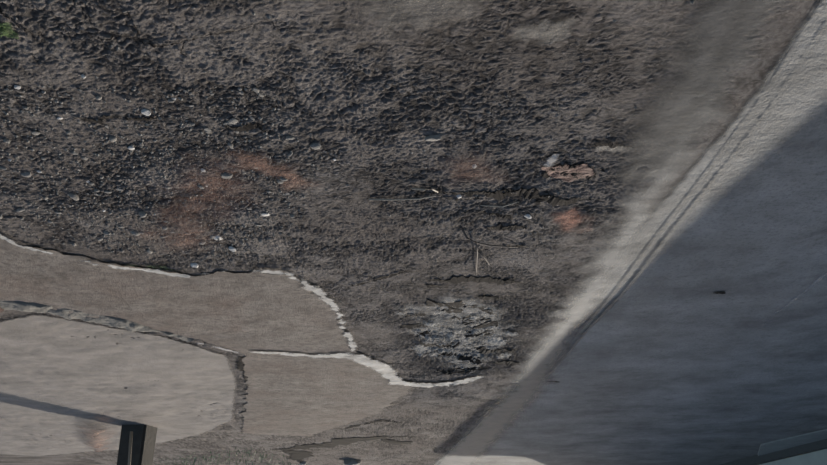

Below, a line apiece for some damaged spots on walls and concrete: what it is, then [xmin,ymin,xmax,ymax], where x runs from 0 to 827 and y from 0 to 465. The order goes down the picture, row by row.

crack [415,187,604,248]
water stain [0,234,53,254]
water stain [85,261,191,278]
crack [352,271,522,286]
water stain [251,270,484,388]
spalling [398,285,519,375]
crack [236,357,248,382]
crack [270,420,417,462]